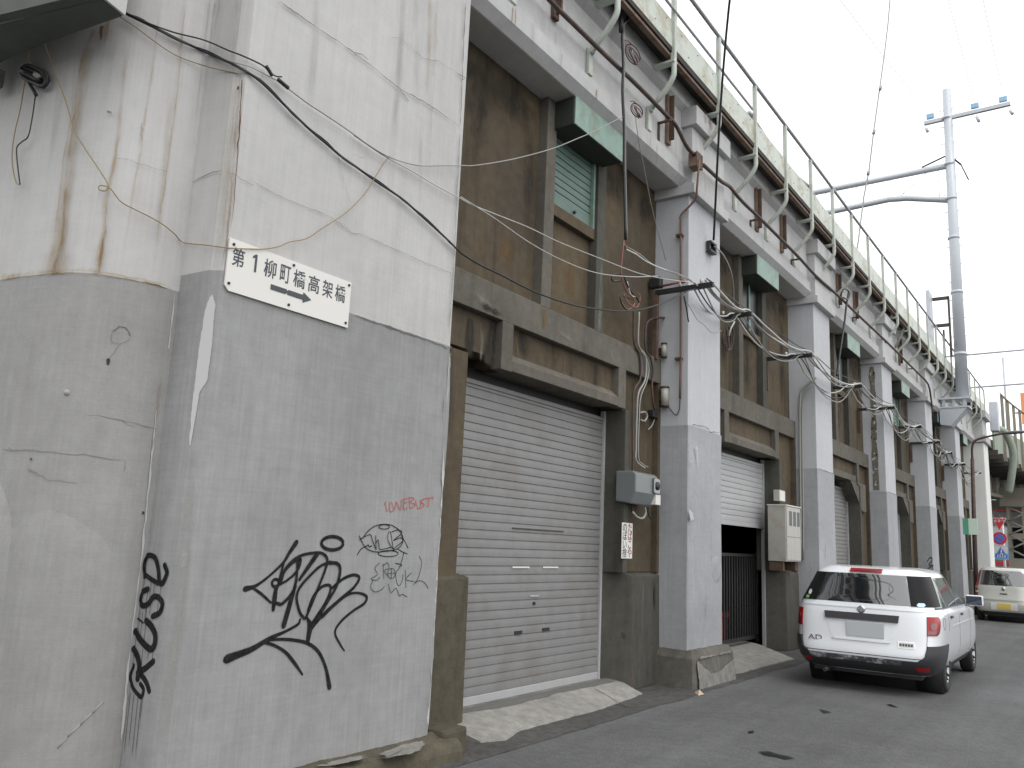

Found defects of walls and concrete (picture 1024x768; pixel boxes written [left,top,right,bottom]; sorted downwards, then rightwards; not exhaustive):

rust [224,81,242,249]
rust [99,239,165,288]
peeling [189,295,216,446]